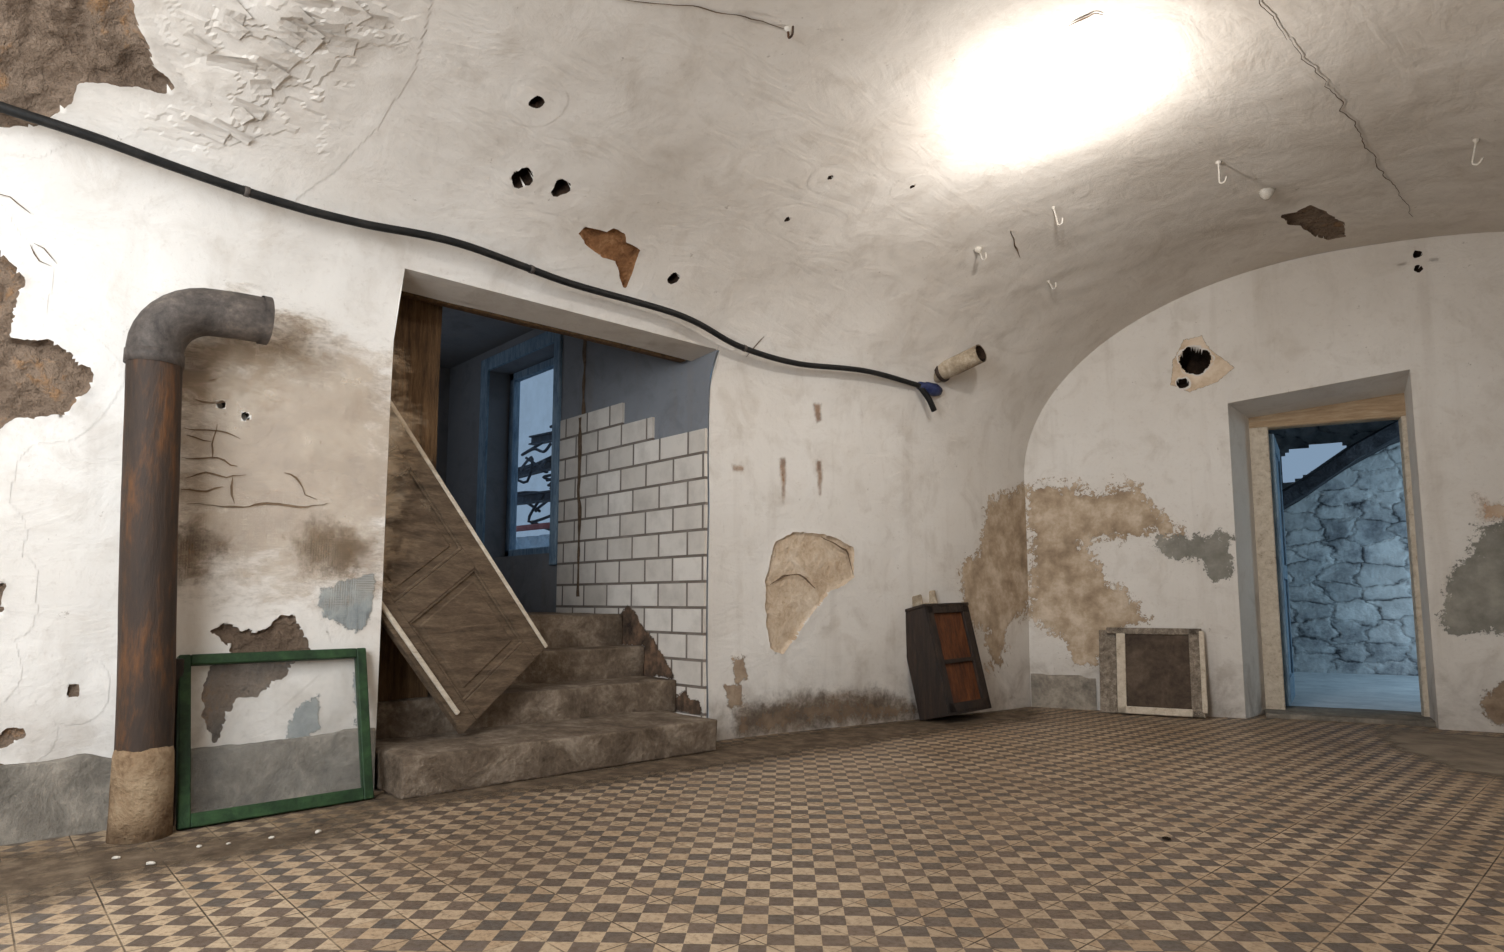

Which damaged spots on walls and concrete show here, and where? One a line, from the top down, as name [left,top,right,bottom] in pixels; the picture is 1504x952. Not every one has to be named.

peeling [0,0,433,202]
crack [1259,0,1413,217]
spalling [488,149,696,306]
spalling [1161,332,1234,403]
spalling [0,206,125,764]
spalling [187,573,376,748]
spalling [723,517,866,709]
peeling [958,473,1235,674]
peeling [1434,502,1504,637]
spalling [1479,680,1504,726]